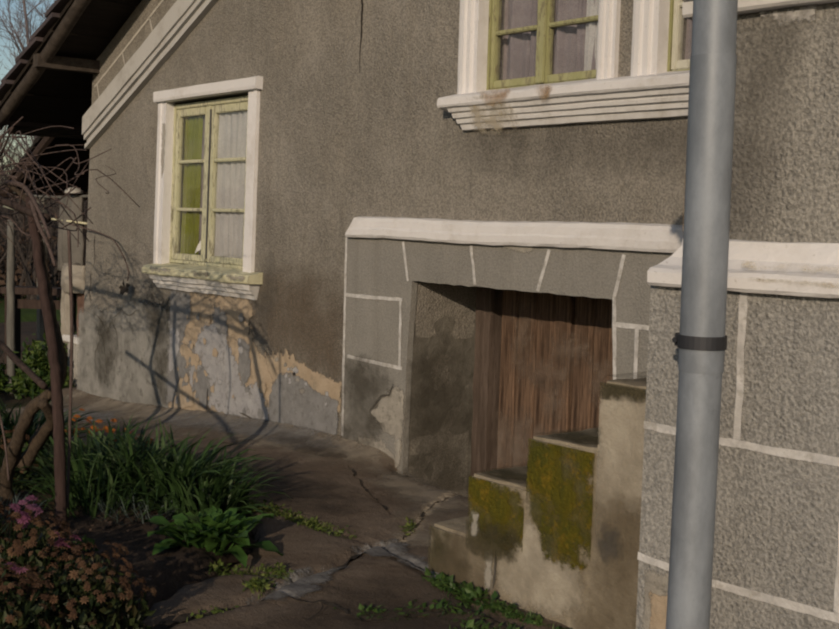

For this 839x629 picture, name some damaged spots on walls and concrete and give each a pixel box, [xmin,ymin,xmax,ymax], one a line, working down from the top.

crack [357,0,365,72]
water stain [63,287,385,470]
flaking render [165,290,342,421]
spalling [357,384,404,472]
crack [348,466,463,559]
water stain [378,444,479,547]
crack [338,554,360,570]
crack [152,608,235,629]